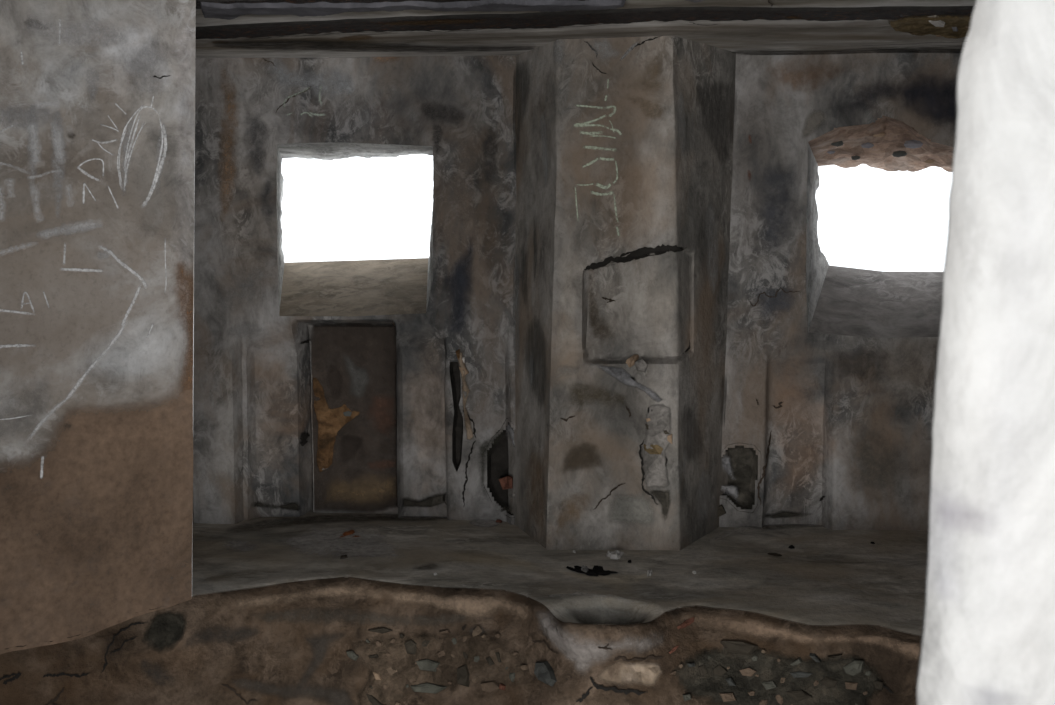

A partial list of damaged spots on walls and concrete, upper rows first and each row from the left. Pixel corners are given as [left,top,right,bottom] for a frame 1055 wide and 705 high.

crack [584,244,683,270]
rust [311,324,398,511]
spalling [450,349,473,471]
spalling [483,418,515,518]
spalling [600,354,672,518]
spalling [718,443,801,518]